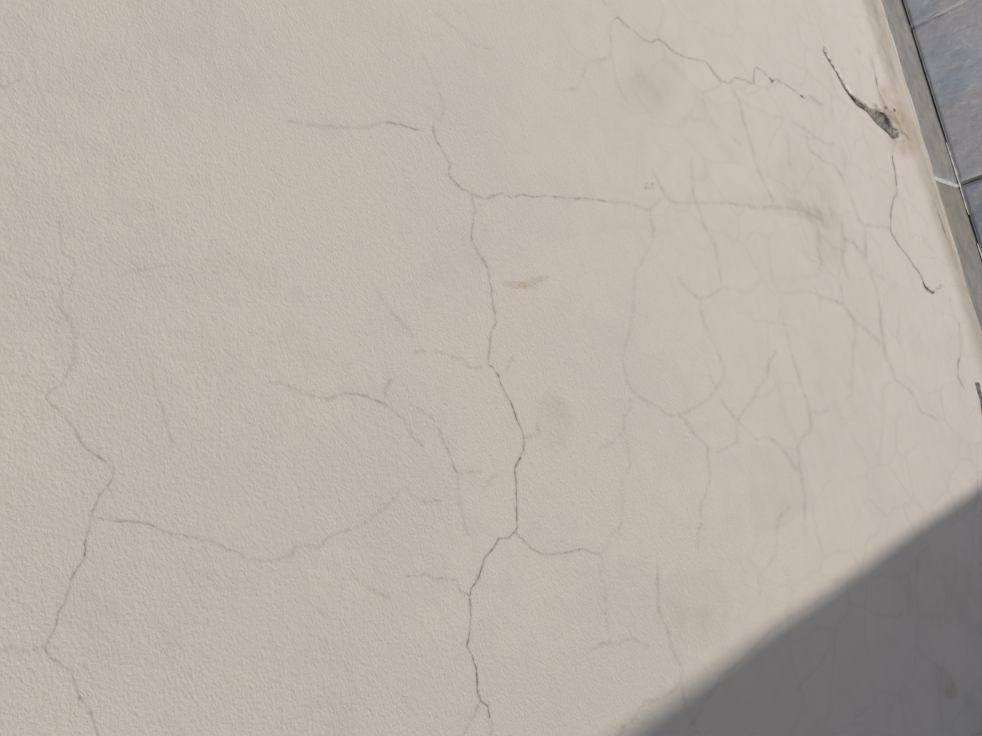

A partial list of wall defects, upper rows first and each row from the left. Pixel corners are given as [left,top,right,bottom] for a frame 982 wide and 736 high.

flaking render [823,52,906,138]